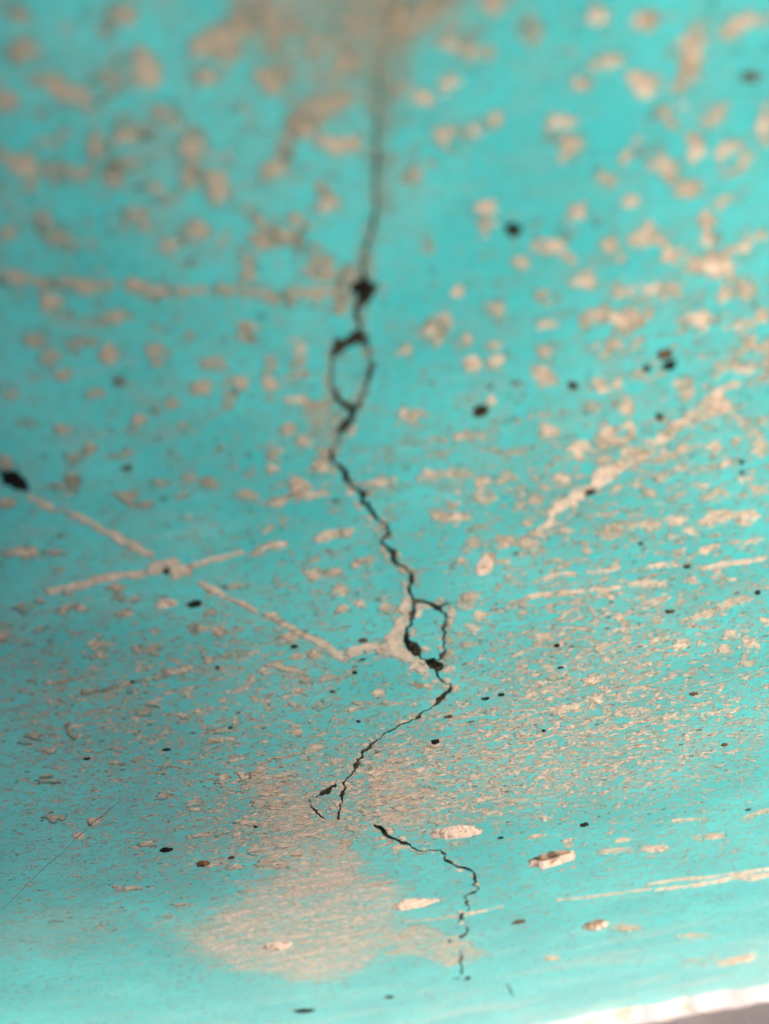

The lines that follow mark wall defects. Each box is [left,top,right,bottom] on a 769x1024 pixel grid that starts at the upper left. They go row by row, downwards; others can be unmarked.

peeling [0,0,231,254]
peeling [186,0,366,184]
peeling [570,4,769,384]
peeling [42,342,494,723]
crack [309,0,453,822]
peeling [416,466,519,527]
peeling [456,369,769,576]
peeling [611,593,769,667]
peeling [392,898,445,911]
crack [373,824,480,980]
peeling [371,798,529,855]
peeling [528,838,576,869]